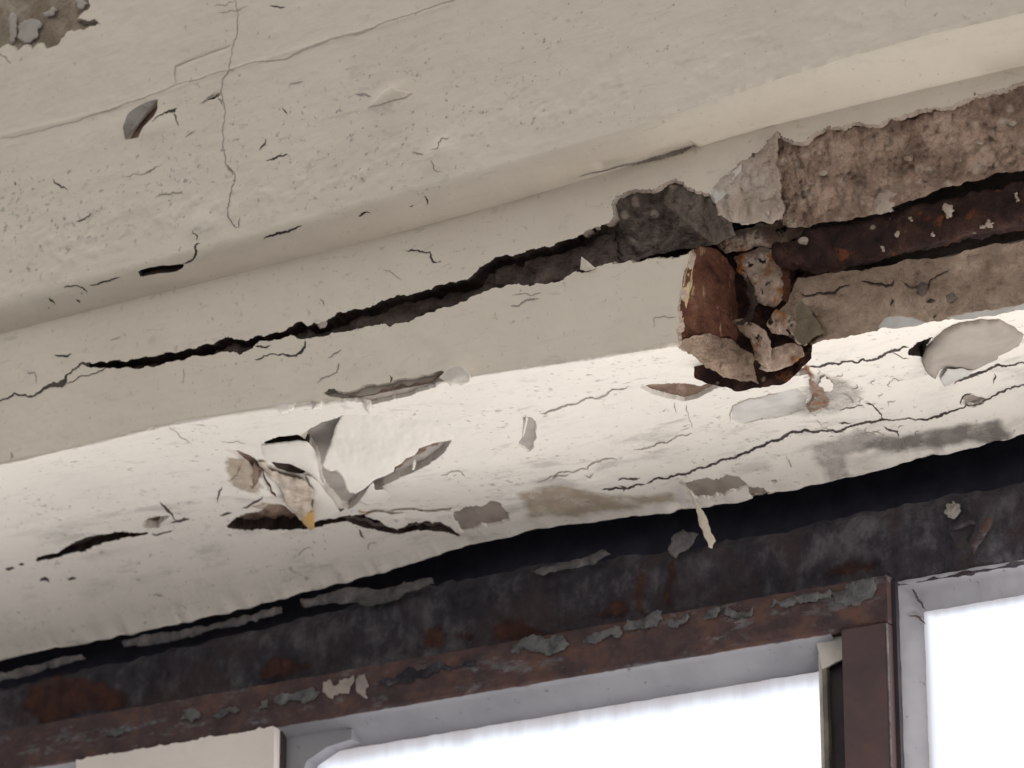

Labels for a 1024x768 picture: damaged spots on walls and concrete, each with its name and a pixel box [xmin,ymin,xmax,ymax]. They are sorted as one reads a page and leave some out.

peeling [0,0,101,50]
crack [5,0,454,228]
crack [264,225,302,239]
spalling [578,81,1024,352]
crack [0,230,619,401]
rust [678,246,759,384]
peeling [217,365,509,539]
spalling [645,383,712,397]
peeling [729,389,806,422]
crack [538,346,1024,492]
rust [805,366,833,413]
rust [495,620,547,640]